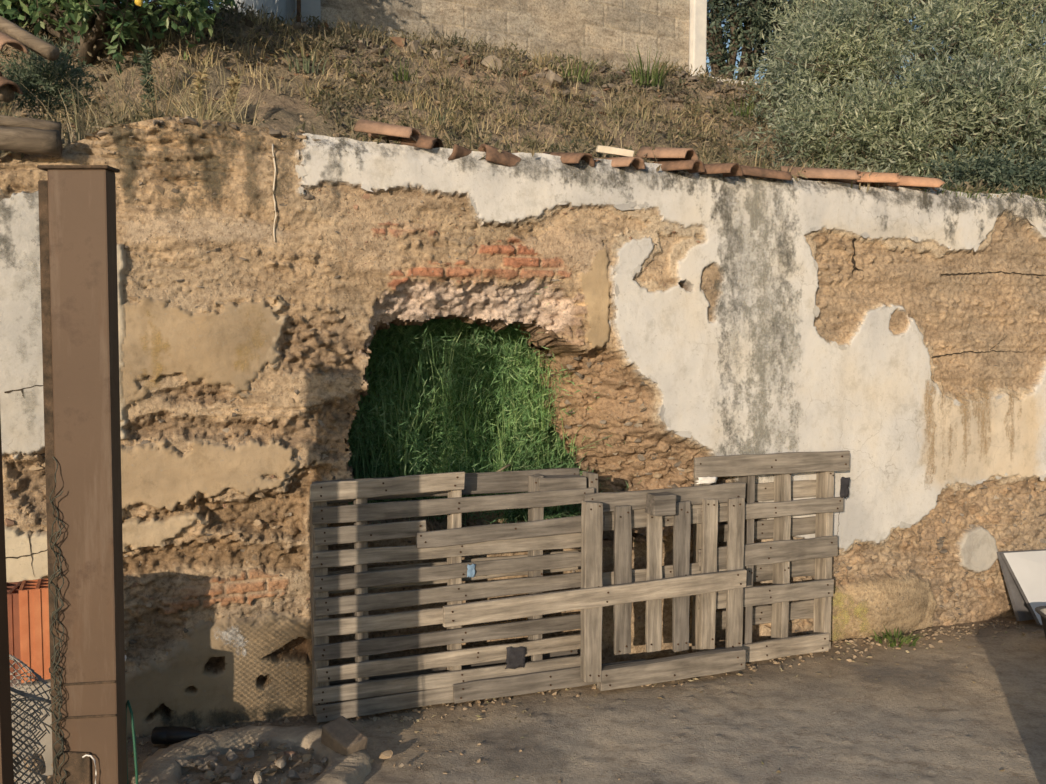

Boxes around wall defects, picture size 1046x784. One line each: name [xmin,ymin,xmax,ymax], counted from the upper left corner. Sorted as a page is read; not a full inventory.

water stain [514,156,693,192]
water stain [898,190,975,234]
water stain [986,193,1046,220]
spalling [700,262,727,323]
water stain [711,176,793,382]
spalling [803,208,1046,406]
crack [941,269,1044,277]
spalling [0,115,721,673]
water stain [925,376,936,480]
spalling [832,473,1046,627]
spalling [715,629,726,648]
spalling [752,623,771,643]